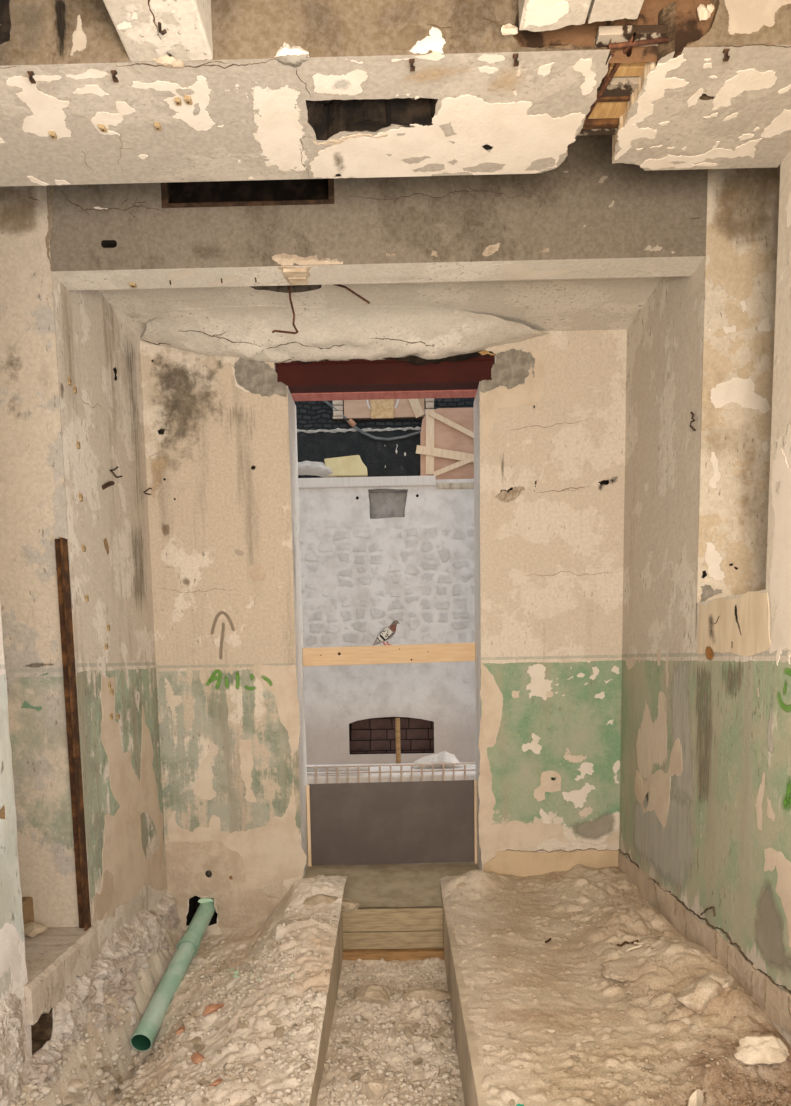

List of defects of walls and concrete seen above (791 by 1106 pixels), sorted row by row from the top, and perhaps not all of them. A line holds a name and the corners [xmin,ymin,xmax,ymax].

peeling [6,69,136,139]
peeling [132,76,224,131]
crack [118,59,272,69]
peeling [225,0,791,178]
spalling [209,253,370,334]
water stain [158,361,213,442]
peeling [710,377,771,414]
crack [537,485,590,493]
peeling [761,441,791,666]
spalling [478,648,791,1035]
peeling [0,665,307,1106]
crack [508,848,791,1017]